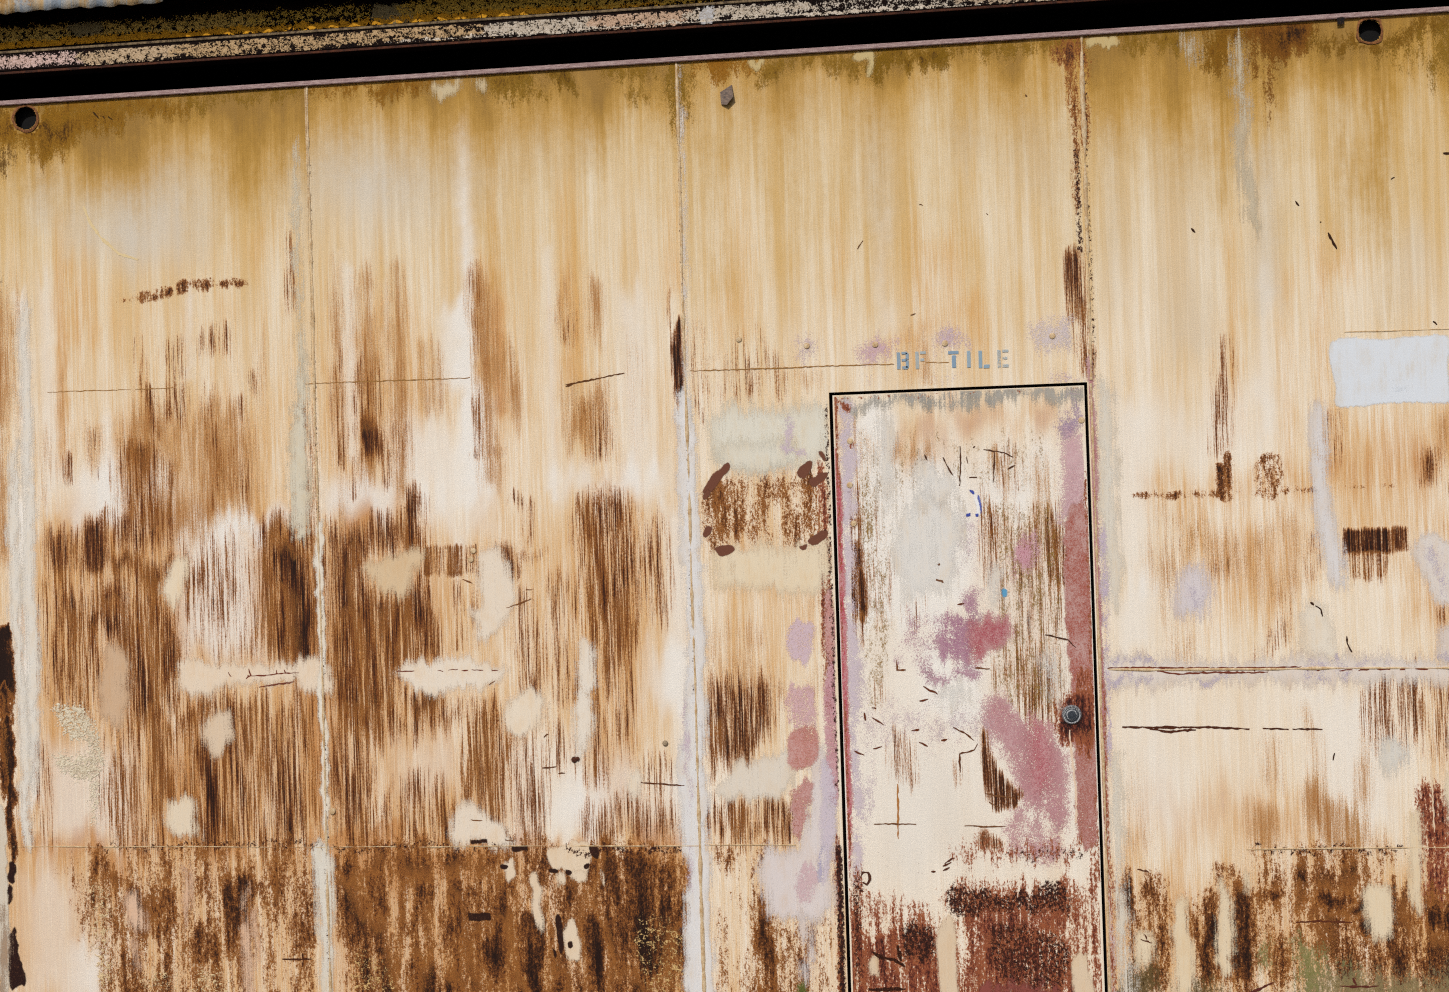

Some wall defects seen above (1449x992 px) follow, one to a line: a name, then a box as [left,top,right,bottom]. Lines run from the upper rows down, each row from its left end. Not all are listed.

corrosion [284,231,296,308]
corrosion [667,262,785,422]
corrosion [1050,37,1096,390]
corrosion [0,262,700,992]
peeling [703,526,735,557]
peeling [780,312,1156,992]
corrosion [687,336,1449,992]